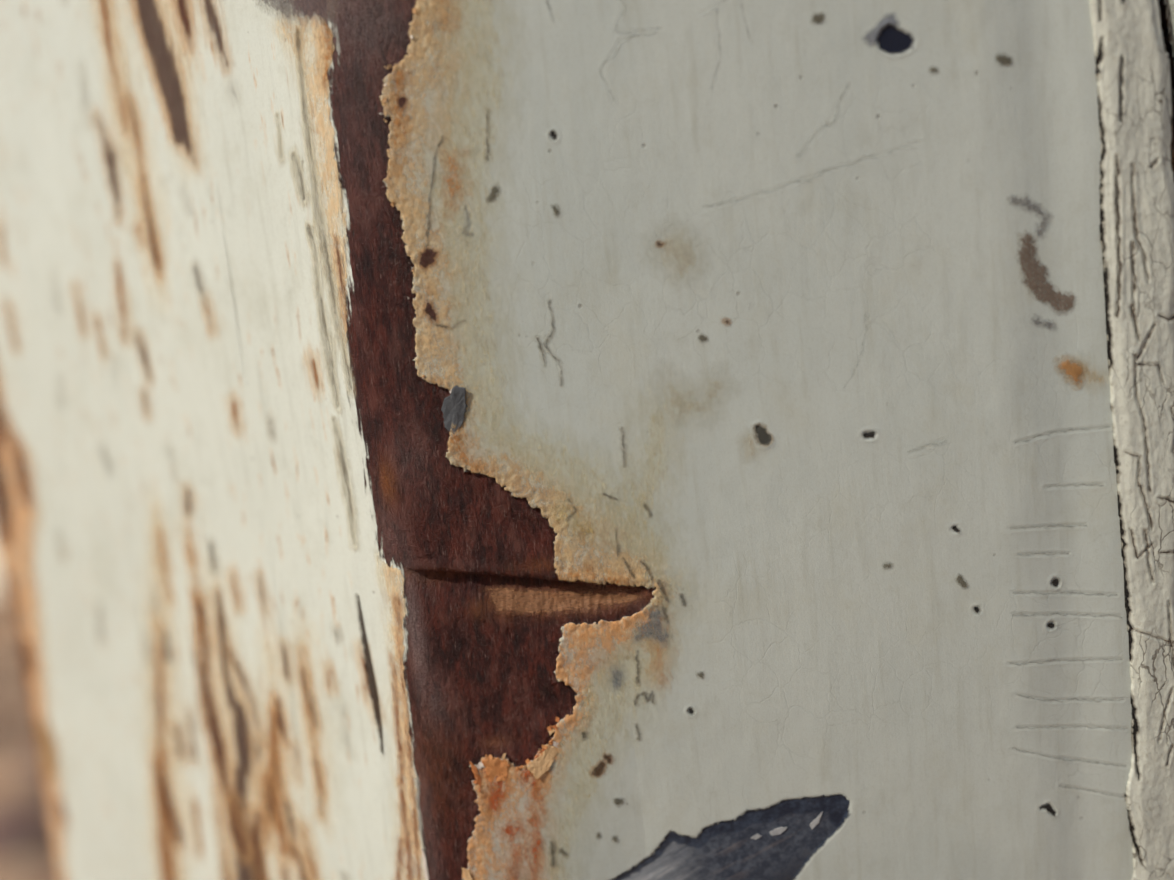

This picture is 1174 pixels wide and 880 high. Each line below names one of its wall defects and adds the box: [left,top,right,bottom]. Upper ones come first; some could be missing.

corrosion [99,0,163,273]
corrosion [115,260,151,415]
corrosion [135,0,195,164]
corrosion [203,0,228,67]
corrosion [282,18,348,339]
peeling [281,0,656,880]
corrosion [380,0,663,880]
corrosion [1058,360,1083,384]
crack [1095,0,1174,863]
corrosion [0,393,66,880]
corrosion [153,531,323,880]